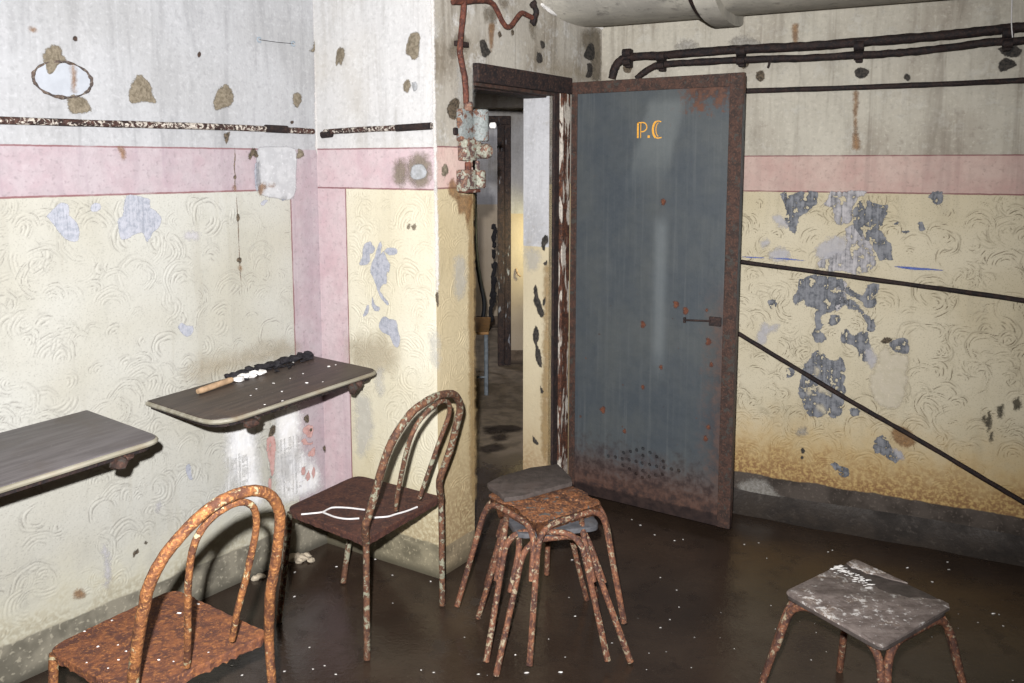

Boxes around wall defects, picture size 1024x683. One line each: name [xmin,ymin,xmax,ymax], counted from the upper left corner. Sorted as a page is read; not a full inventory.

spalling [43,45,66,74]
spalling [67,95,91,114]
spalling [129,75,156,103]
spalling [213,84,234,110]
rust [447,98,460,119]
rust [472,82,555,96]
peeling [359,242,400,347]
spalling [533,285,546,367]
peeling [773,190,925,434]
damp [225,423,263,504]
damp [275,408,320,502]
damp [739,479,779,497]